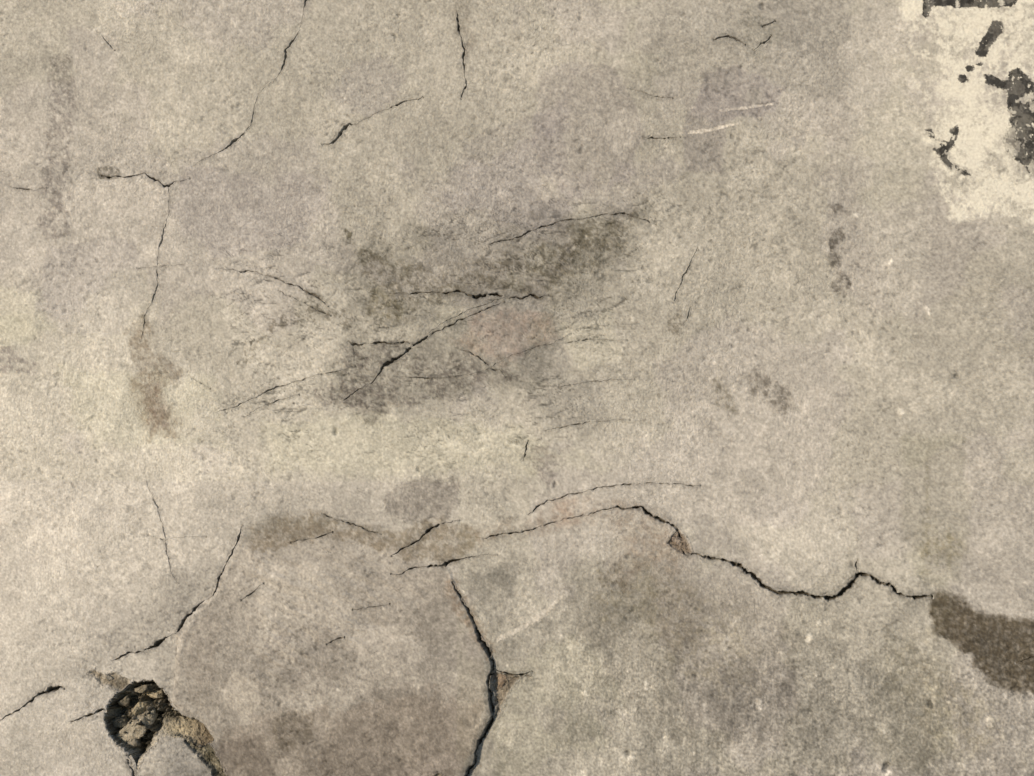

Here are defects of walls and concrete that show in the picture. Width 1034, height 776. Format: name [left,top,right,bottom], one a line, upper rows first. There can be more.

crack [454,10,469,99]
crack [100,0,310,342]
crack [322,96,424,147]
crack [490,210,656,246]
crack [217,267,331,317]
crack [192,288,634,418]
water stain [914,449,973,575]
crack [0,684,65,722]
crack [71,707,107,724]
crack [112,525,264,662]
crack [291,481,932,776]
water stain [876,587,1034,767]